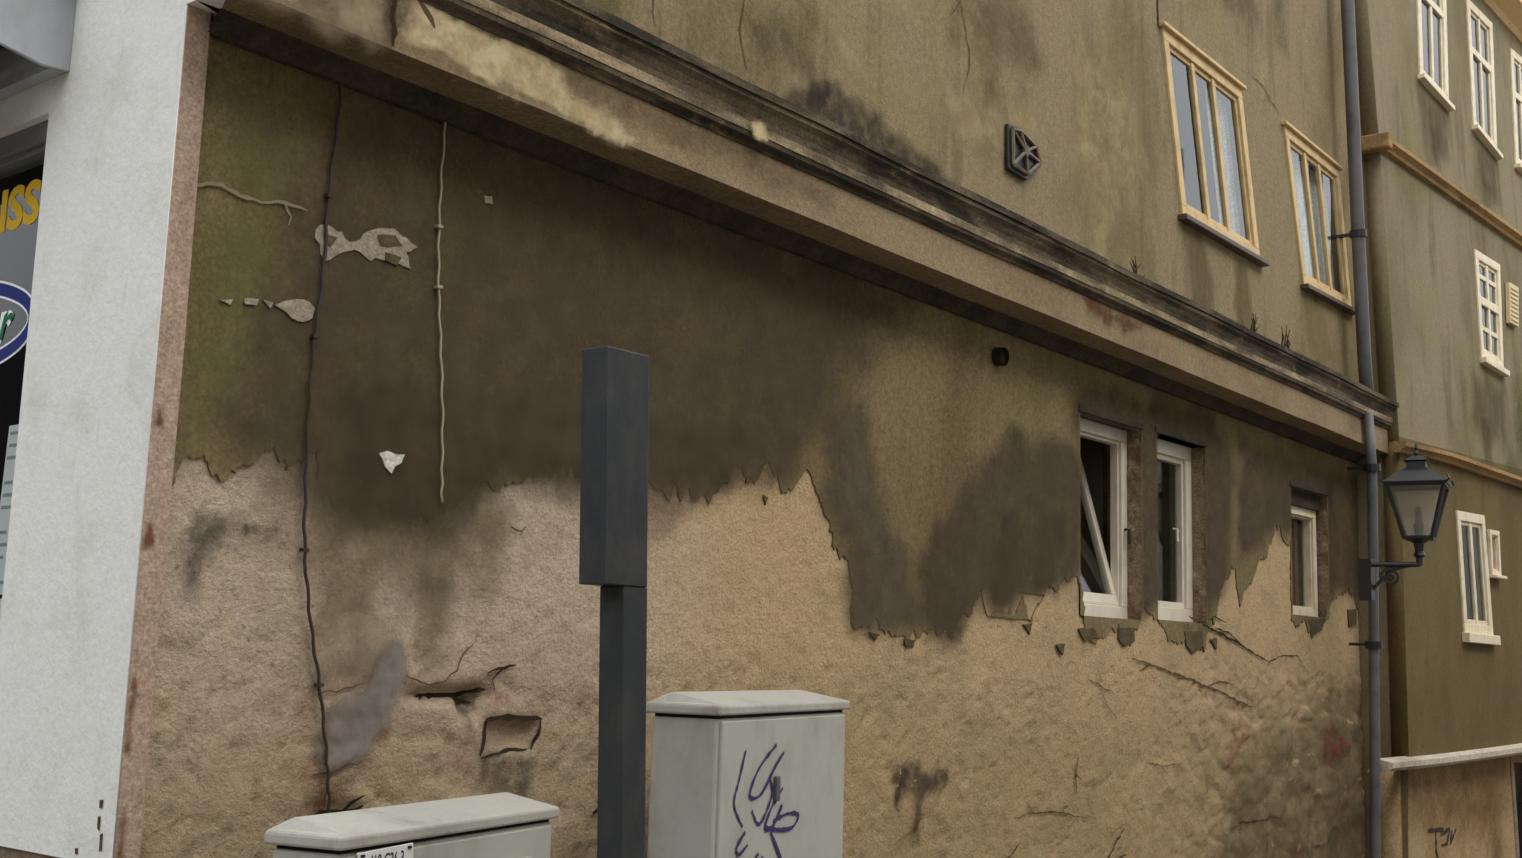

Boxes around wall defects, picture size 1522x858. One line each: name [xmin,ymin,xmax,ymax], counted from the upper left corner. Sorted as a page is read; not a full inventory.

peeling [286,0,639,146]
flaking render [314,225,417,269]
flaking render [219,298,315,322]
leakage [244,103,894,516]
leakage [188,518,225,582]
leakage [828,406,1080,637]
flaking render [140,447,600,858]
crack [406,641,516,690]
flaking render [645,465,1366,858]
crack [1088,658,1255,717]
crack [1189,616,1308,672]
crack [312,761,363,803]